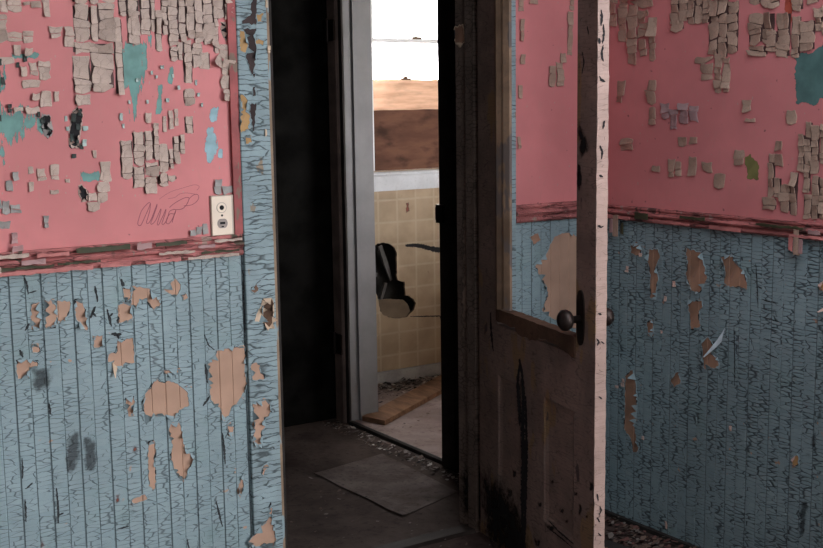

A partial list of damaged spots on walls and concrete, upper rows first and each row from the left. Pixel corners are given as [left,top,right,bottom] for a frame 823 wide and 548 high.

peeling [670,0,823,94]
peeling [0,0,271,212]
peeling [756,110,823,255]
crack [90,286,122,339]
peeling [0,200,242,277]
crack [240,270,248,365]
peeling [534,231,576,330]
crack [203,334,215,406]
peeling [207,345,272,448]
crack [22,459,33,522]
crack [56,488,64,523]
crack [220,433,228,464]